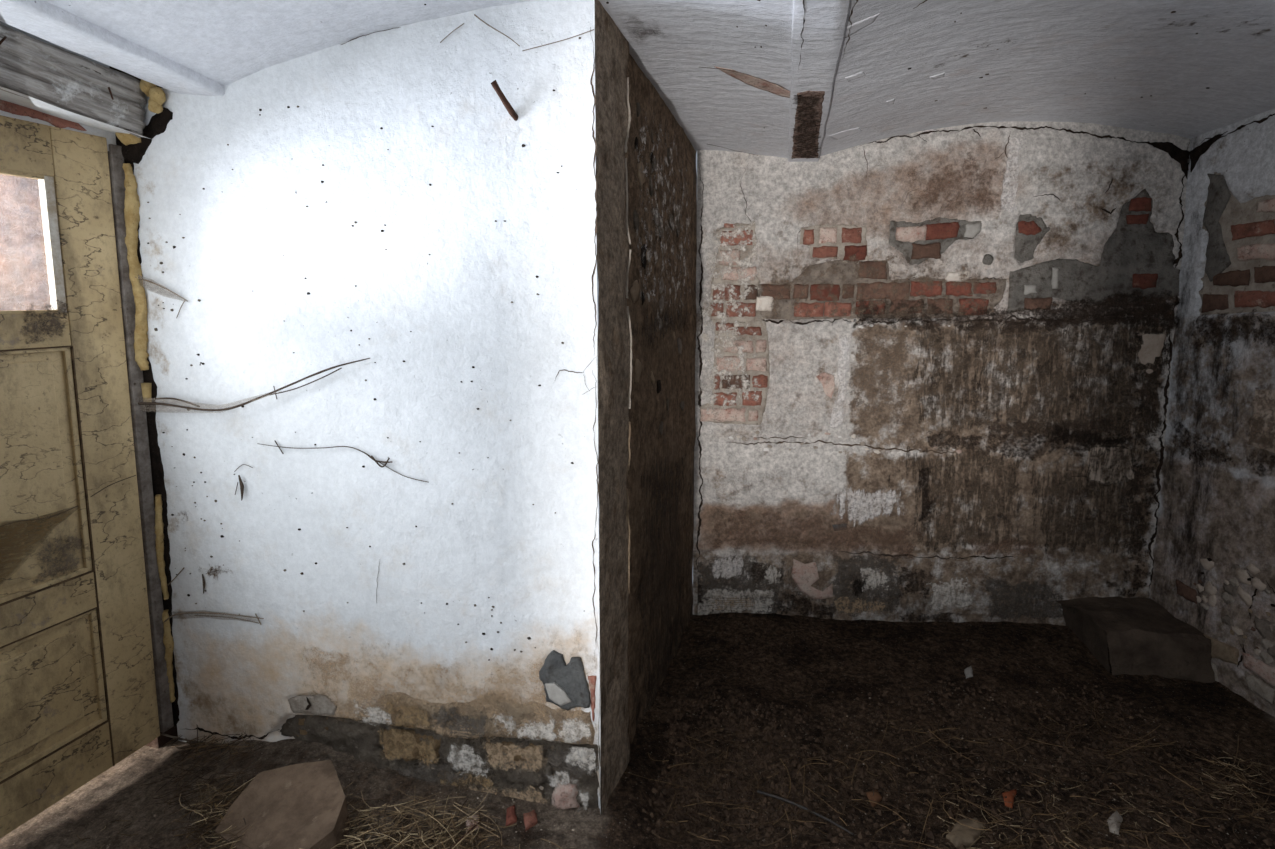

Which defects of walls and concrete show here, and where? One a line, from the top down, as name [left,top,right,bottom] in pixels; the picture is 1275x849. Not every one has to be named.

crack [995,131,1060,204]
flaking render [1199,172,1275,315]
peeling [625,77,685,593]
crack [696,164,966,579]
crack [740,314,1135,325]
spalling [700,189,1180,454]
crack [1148,114,1275,598]
water stain [713,289,1275,599]
spalling [697,554,903,617]
crack [841,551,1015,560]
water stain [311,651,590,743]
spalling [354,675,597,745]